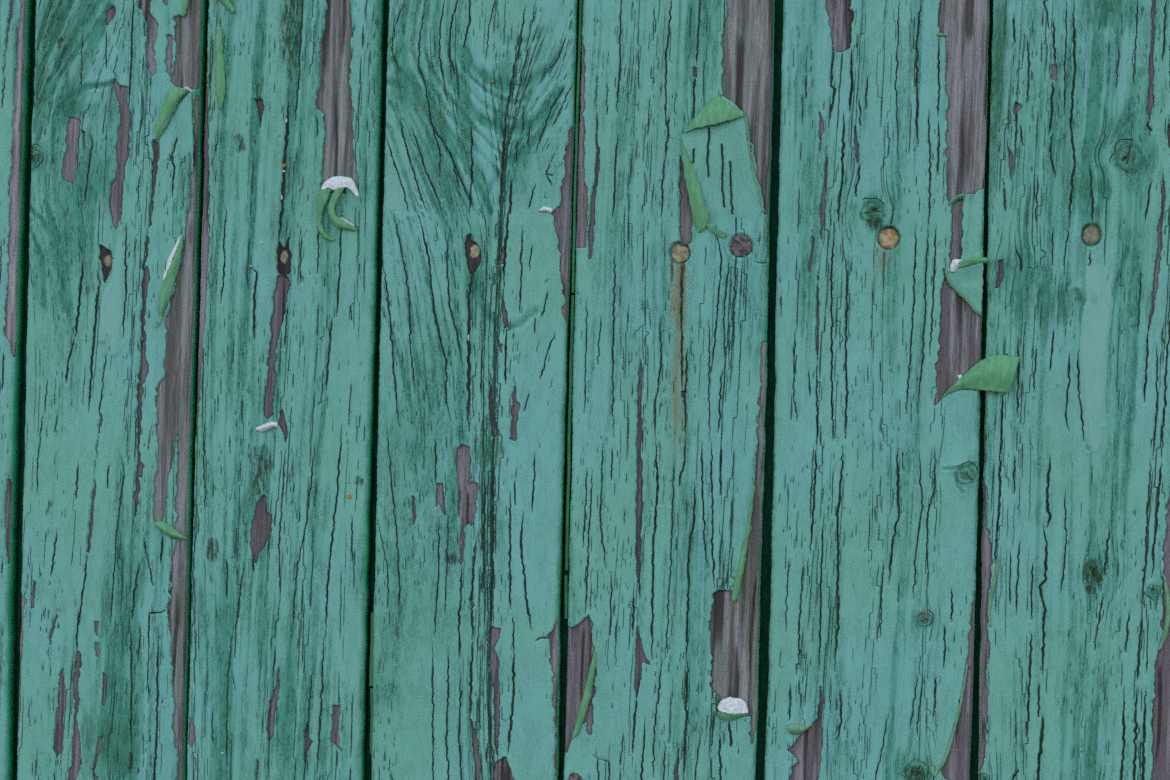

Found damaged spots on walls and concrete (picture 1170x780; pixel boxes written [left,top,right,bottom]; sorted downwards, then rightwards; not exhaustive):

peeling [3,0,27,357]
peeling [133,0,235,780]
peeling [256,237,292,441]
crack [0,0,573,780]
peeling [316,0,362,242]
peeling [548,615,597,777]
peeling [679,0,774,246]
peeling [709,341,767,744]
crack [569,0,971,780]
peeling [933,0,1019,780]
crack [986,0,1170,780]
peeling [1151,492,1170,780]